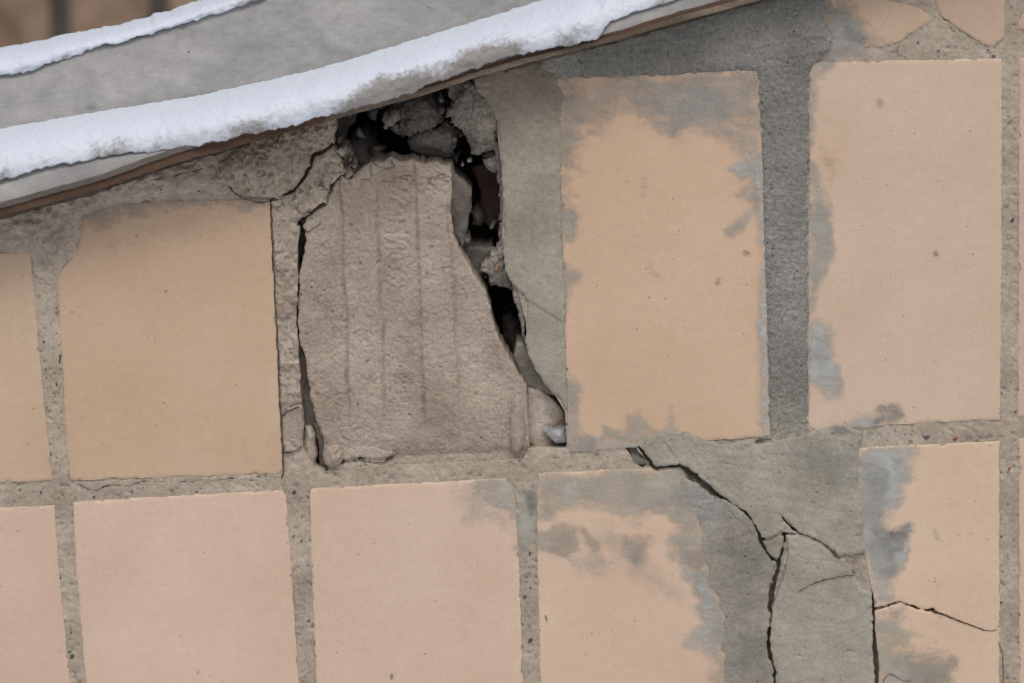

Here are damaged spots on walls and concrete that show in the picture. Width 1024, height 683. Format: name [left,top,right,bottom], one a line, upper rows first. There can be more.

leakage [560,72,764,241]
spalling [271,79,567,475]
leakage [758,266,769,432]
leakage [478,468,729,683]
crack [638,446,854,683]
crack [872,593,1004,683]